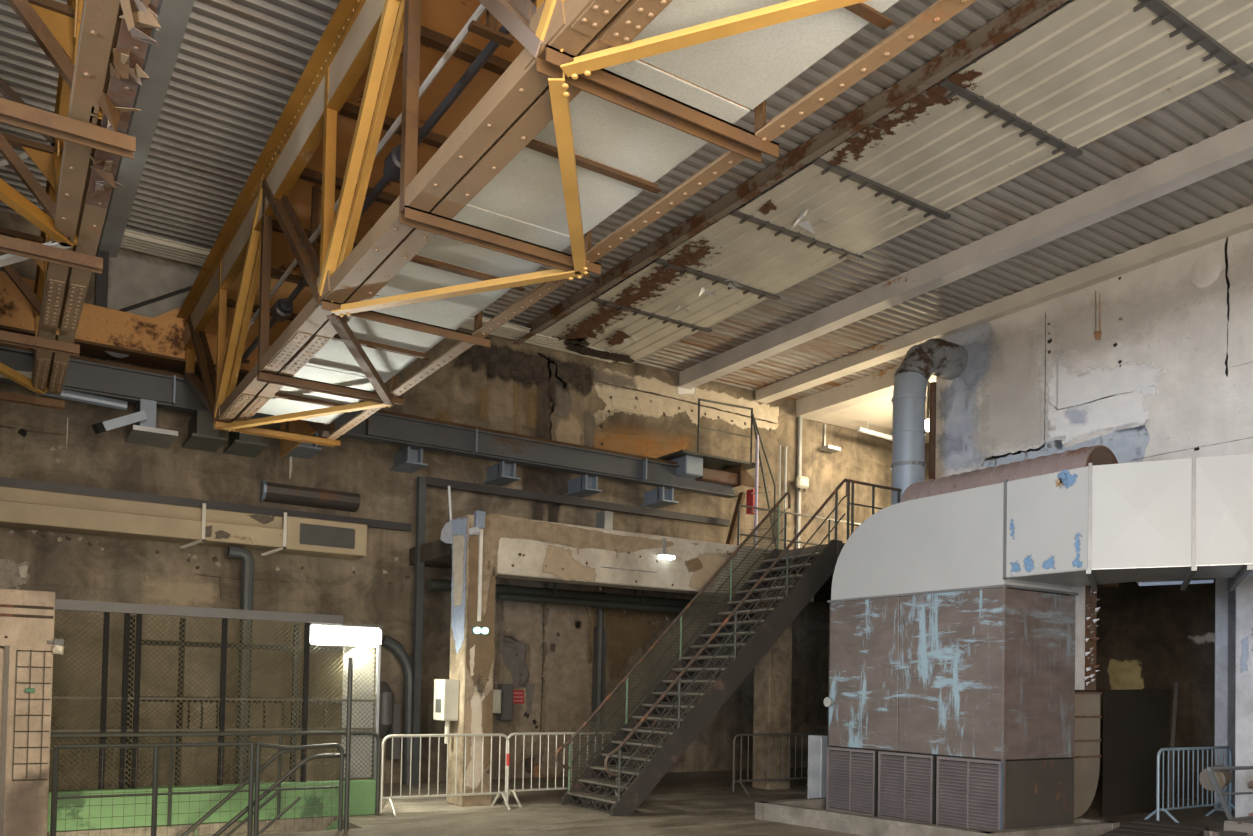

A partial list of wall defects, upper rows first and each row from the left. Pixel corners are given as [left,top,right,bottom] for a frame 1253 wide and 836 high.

rust [822,61,982,166]
rust [757,199,778,214]
rust [551,240,722,347]
crack [1224,237,1251,377]
peeling [482,514,674,590]
peeling [451,518,492,807]
peeling [490,601,593,777]